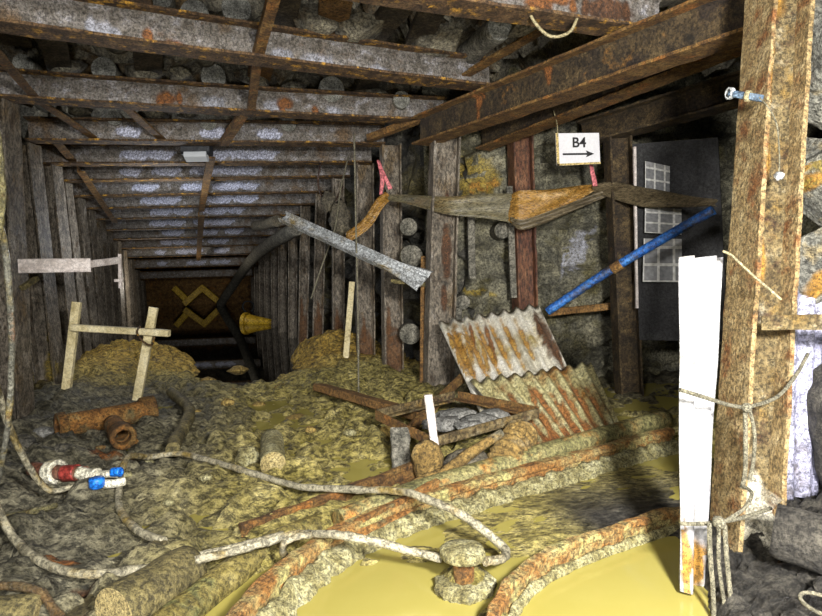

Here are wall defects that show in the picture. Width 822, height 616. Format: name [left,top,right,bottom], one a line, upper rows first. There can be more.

corrosion [526,0,630,21]
corrosion [447,320,535,379]
corrosion [534,313,565,369]
corrosion [528,381,608,444]
corrosion [680,527,707,594]